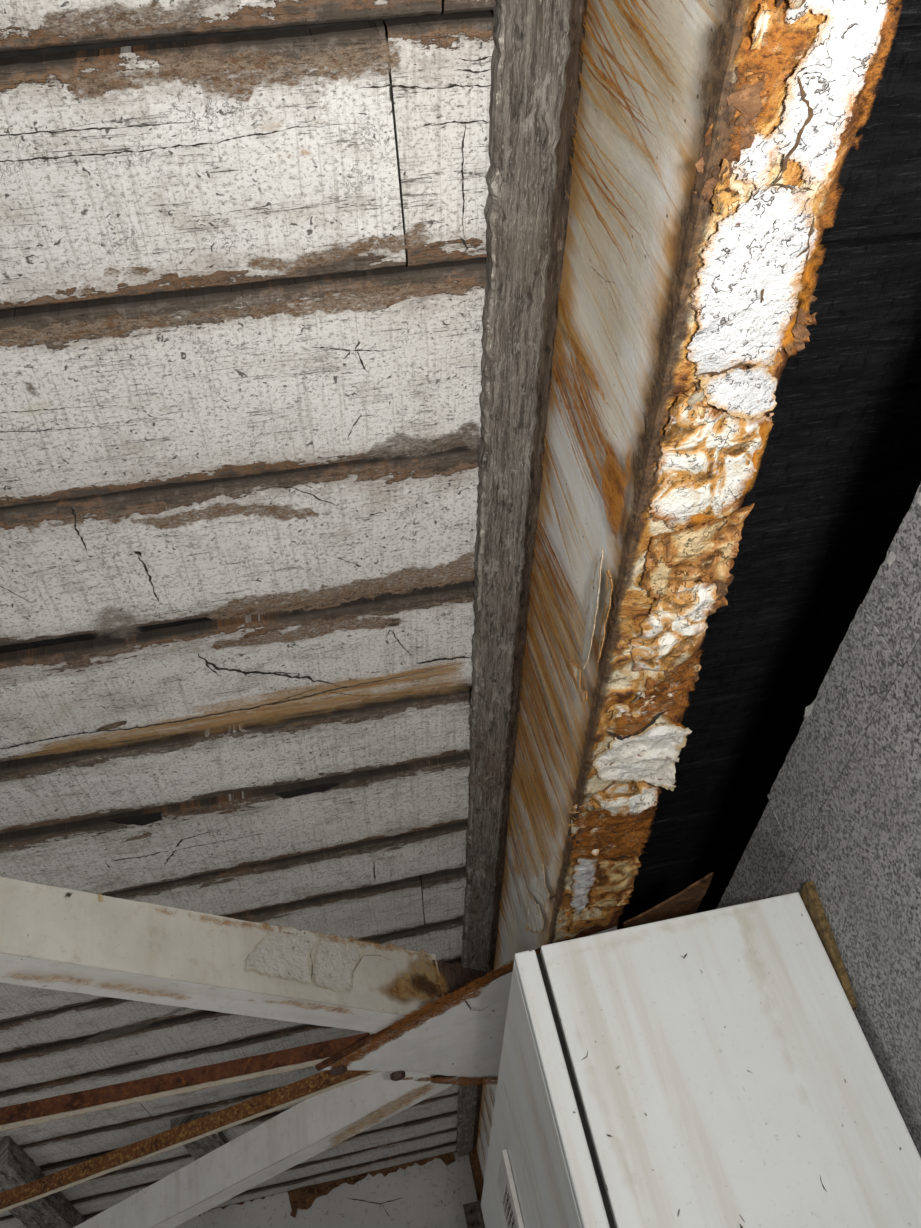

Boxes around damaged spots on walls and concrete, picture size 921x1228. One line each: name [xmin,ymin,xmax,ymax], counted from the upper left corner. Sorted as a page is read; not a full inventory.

peeling [43,0,203,39]
peeling [69,41,400,101]
rust [854,0,897,145]
peeling [248,223,430,274]
peeling [0,279,469,348]
rust [780,249,824,356]
rust [315,0,816,1075]
crack [0,629,472,749]
peeling [588,723,692,816]
peeling [570,855,641,914]
rust [334,1077,498,1163]
rust [221,1151,457,1218]